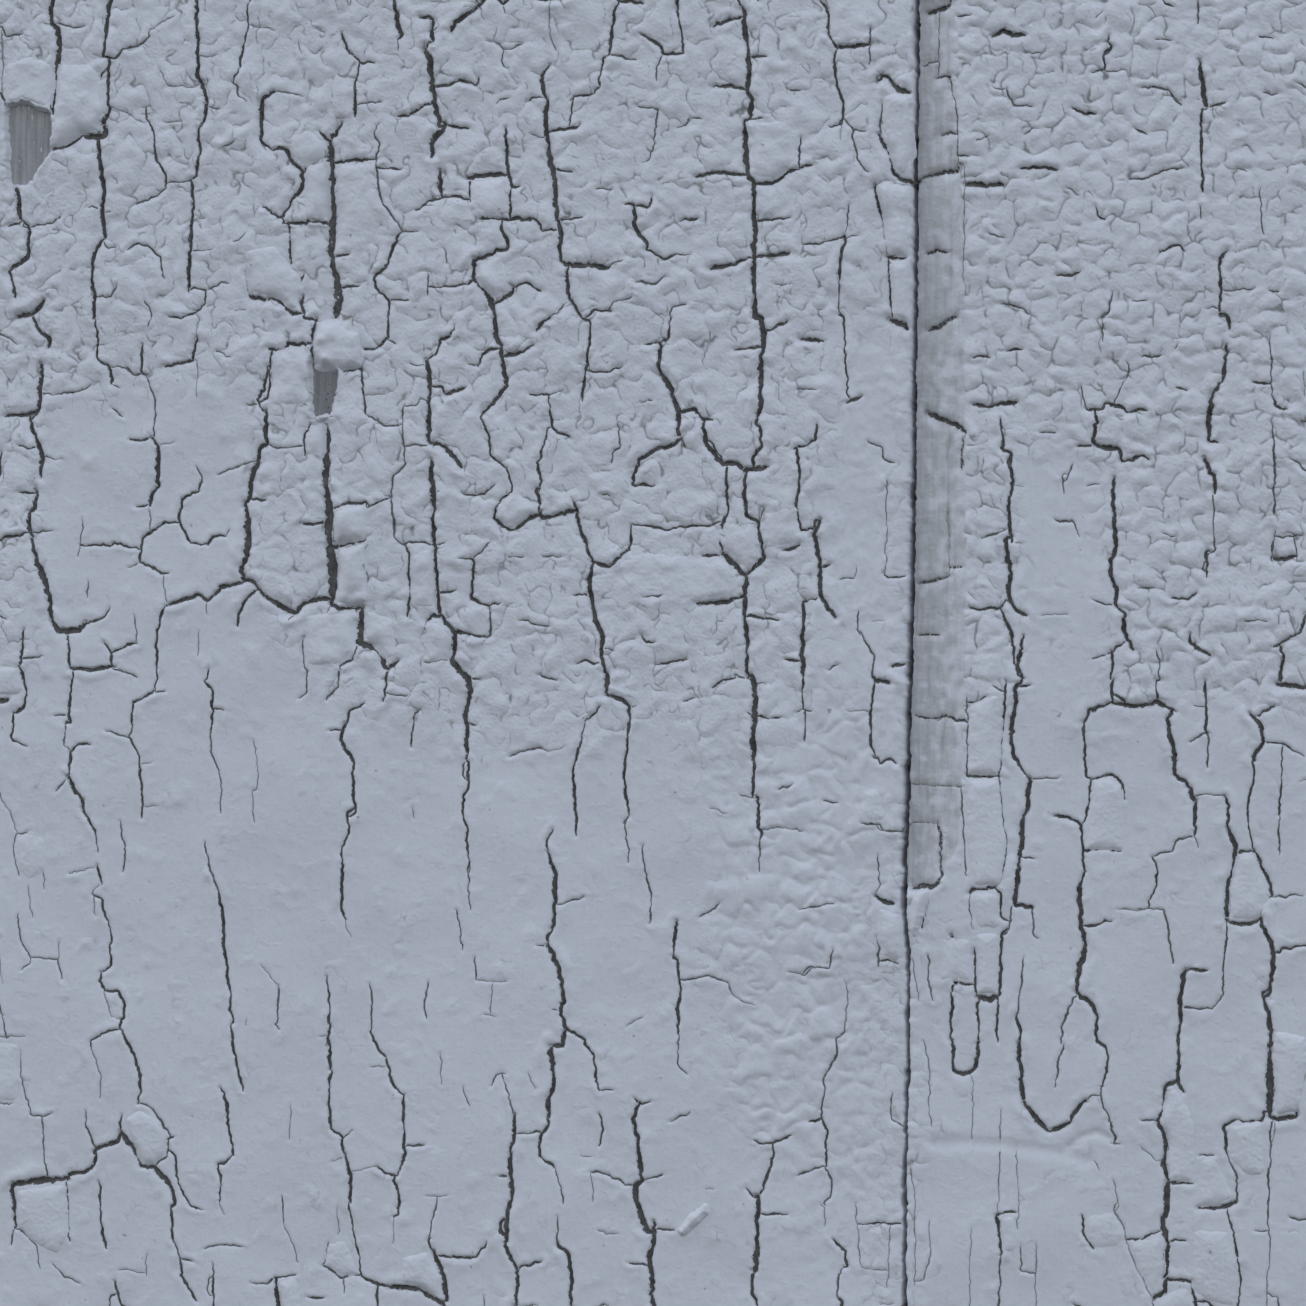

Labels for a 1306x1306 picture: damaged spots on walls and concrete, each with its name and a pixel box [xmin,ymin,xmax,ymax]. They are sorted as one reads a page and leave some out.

crack [1155,0,1199,41]
peeling [5,57,103,185]
crack [820,0,1106,332]
crack [1092,11,1226,218]
crack [1159,244,1185,253]
crack [1237,168,1264,234]
peeling [271,319,362,455]
peeling [907,0,1007,996]
peeling [0,667,23,695]
crack [0,0,931,1306]
crack [861,251,1306,1306]